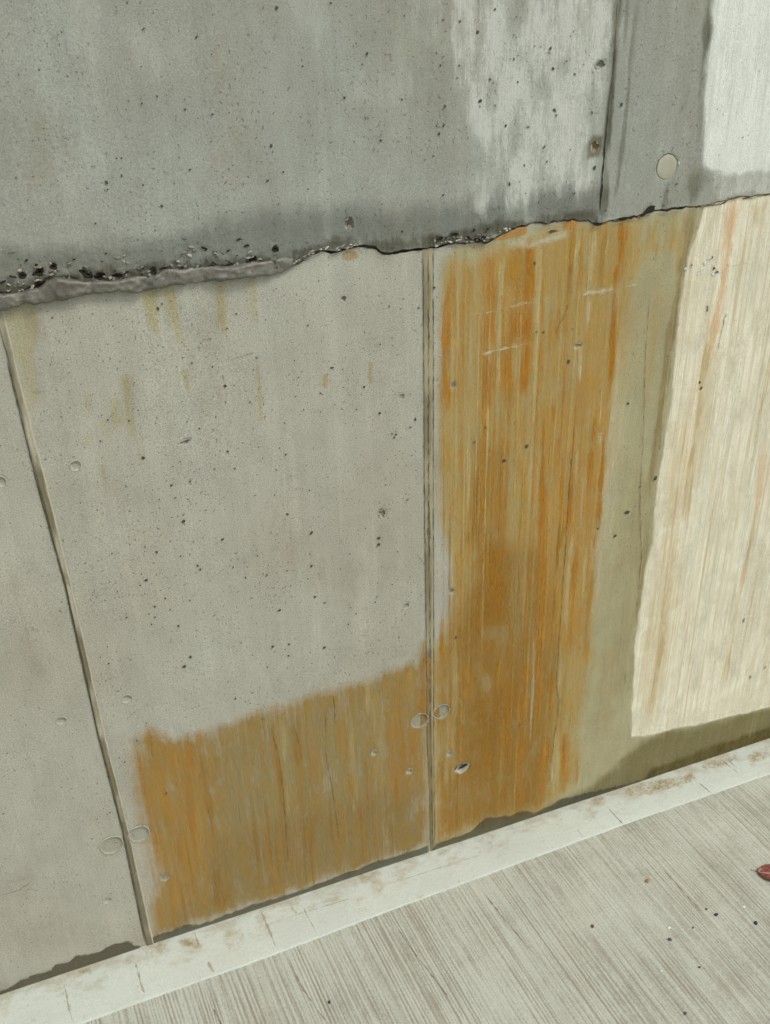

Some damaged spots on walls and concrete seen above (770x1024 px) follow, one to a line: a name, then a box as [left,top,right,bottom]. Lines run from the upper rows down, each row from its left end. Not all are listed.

spalling [0,252,166,293]
spalling [201,238,279,267]
crack [275,193,770,275]
corrosion [139,220,631,933]